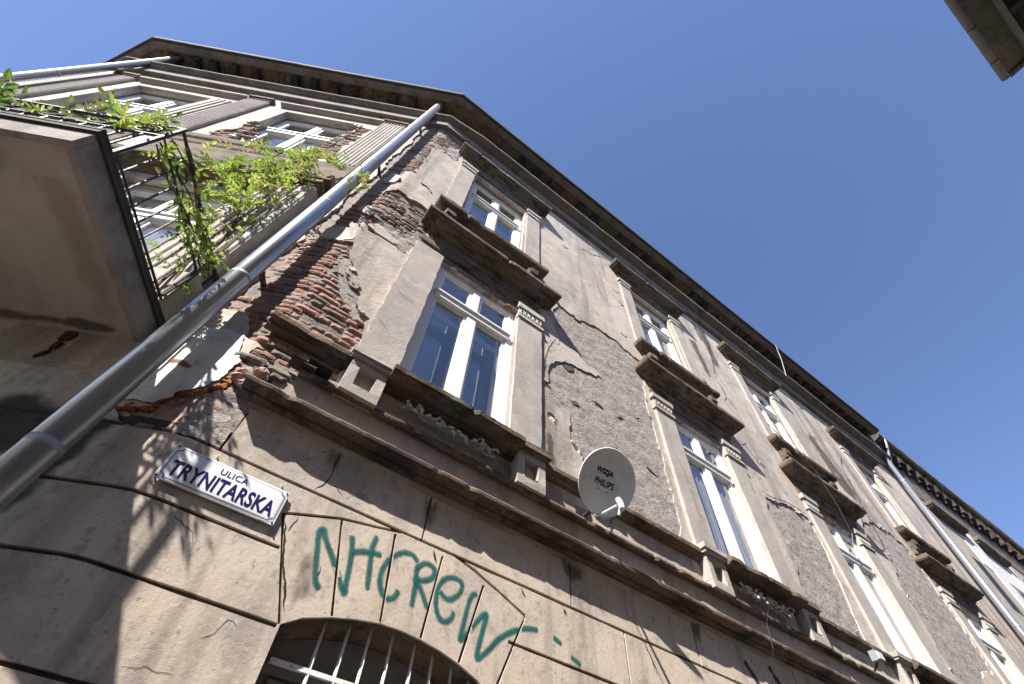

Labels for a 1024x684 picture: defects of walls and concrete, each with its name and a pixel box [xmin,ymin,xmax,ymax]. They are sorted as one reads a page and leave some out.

spalling [115,125,462,446]
crack [314,453,342,495]
spalling [543,305,680,536]
spalling [766,498,991,684]